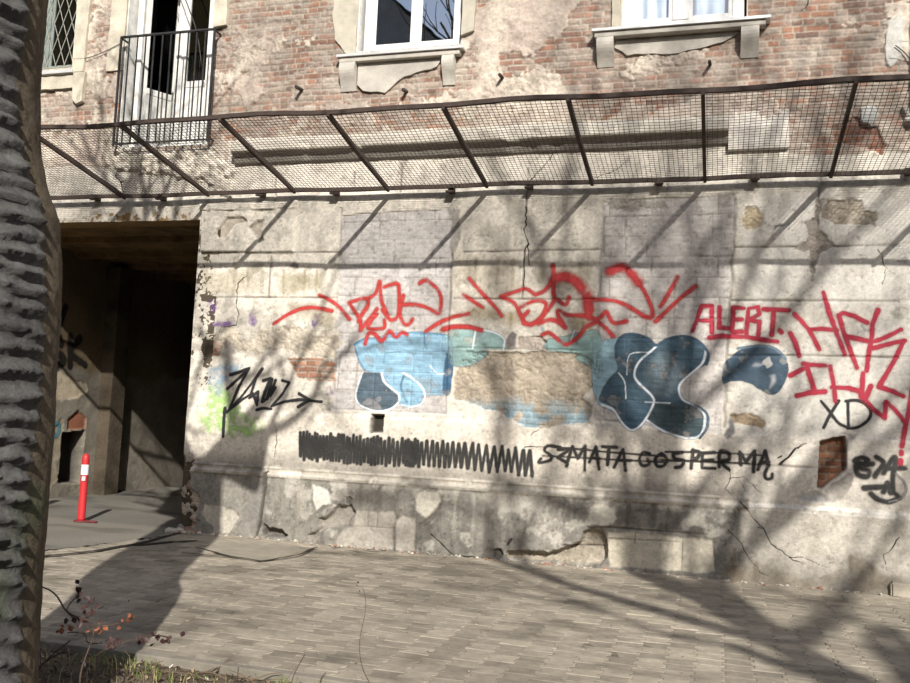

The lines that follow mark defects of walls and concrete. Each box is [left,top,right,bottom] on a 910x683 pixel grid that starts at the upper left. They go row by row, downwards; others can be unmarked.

spalling [831,103,889,156]
spalling [740,203,792,232]
spalling [793,197,881,283]
spalling [201,320,344,383]
spalling [452,329,599,430]
spalling [179,456,289,538]
spalling [301,482,444,552]
crack [725,467,823,566]
spalling [792,429,860,514]